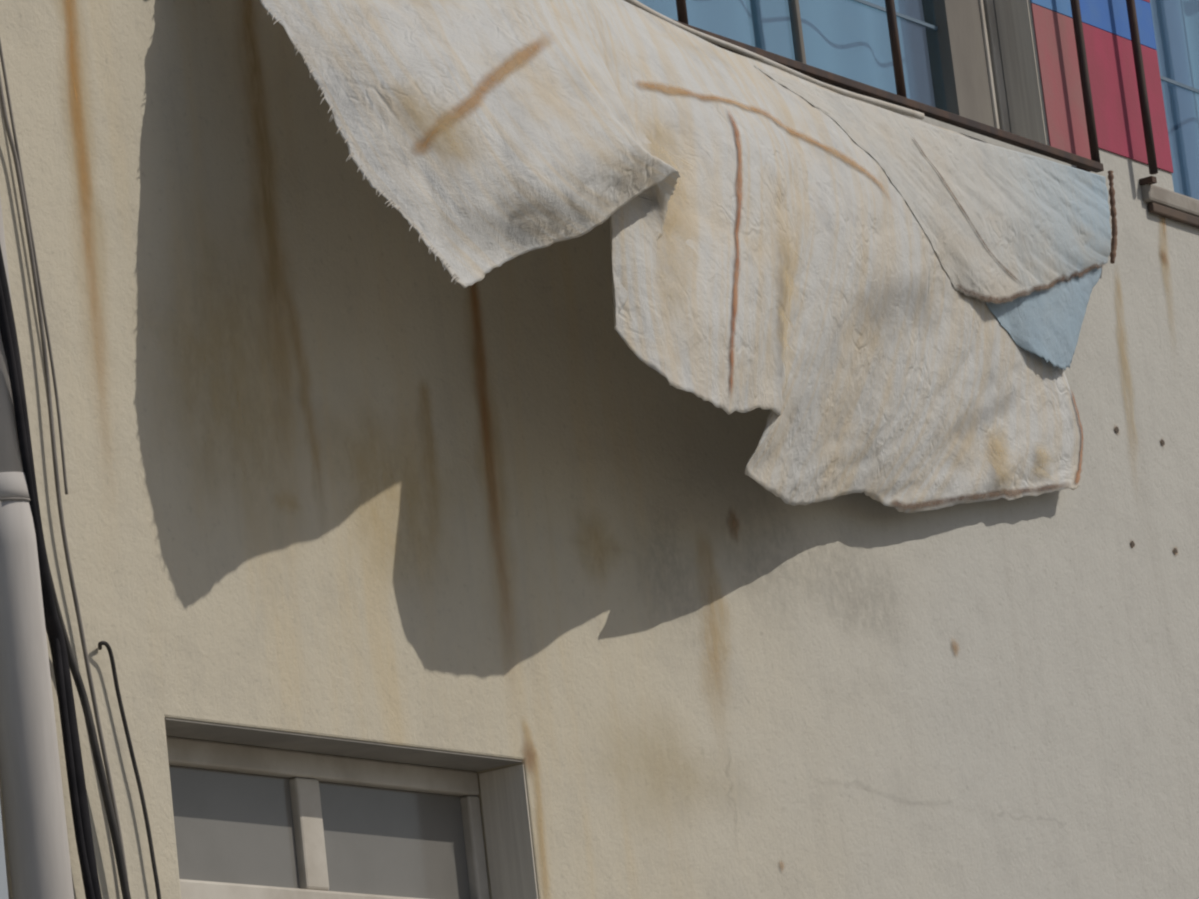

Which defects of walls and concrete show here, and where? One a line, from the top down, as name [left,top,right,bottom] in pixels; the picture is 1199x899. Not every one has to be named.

corrosion [1108,170,1118,264]